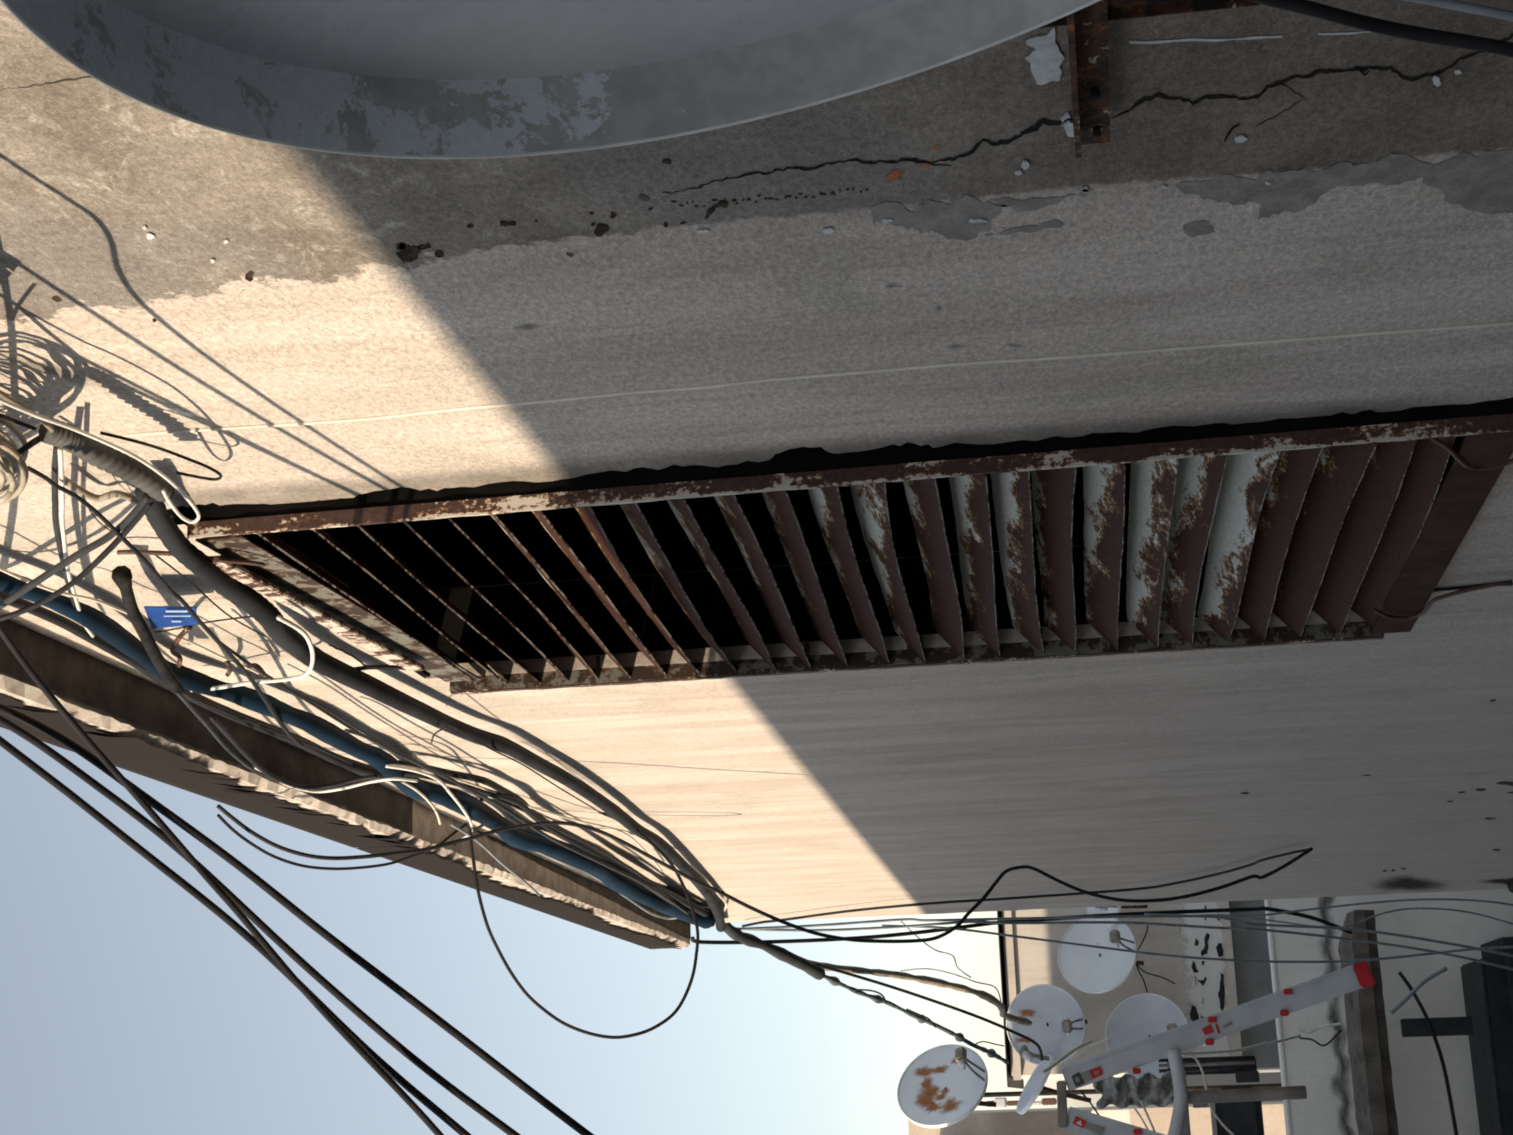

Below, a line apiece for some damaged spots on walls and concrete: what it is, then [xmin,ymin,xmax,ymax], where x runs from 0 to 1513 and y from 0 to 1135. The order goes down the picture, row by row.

crack [6,77,92,89]
crack [1111,34,1513,142]
crack [662,116,1073,195]
peeling [1160,150,1513,219]
spalling [396,243,444,263]
spalling [589,211,616,237]
peeling [639,187,1089,241]
peeling [1183,221,1214,237]